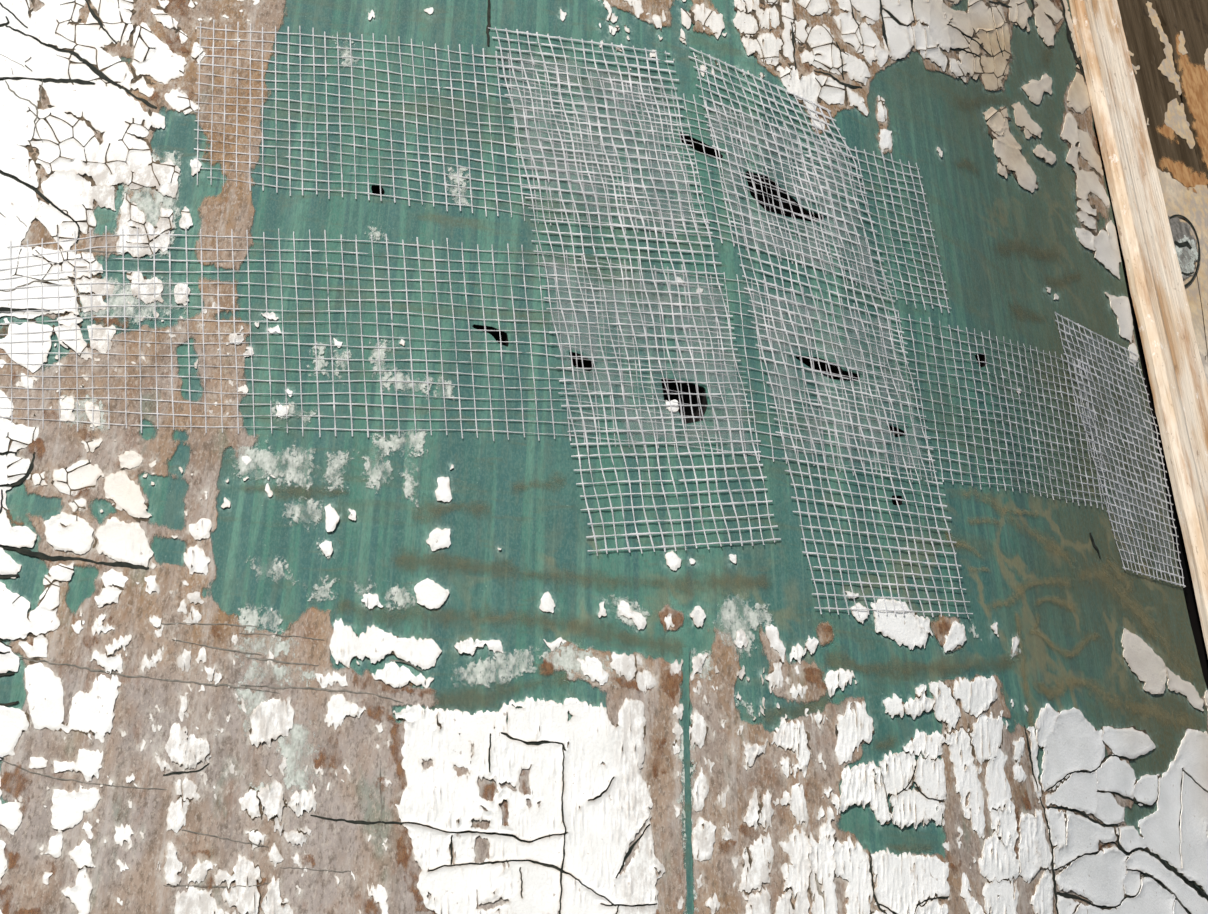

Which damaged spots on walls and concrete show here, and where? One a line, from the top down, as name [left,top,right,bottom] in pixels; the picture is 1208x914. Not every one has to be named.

crack [609,0,915,125]
peeling [598,0,1121,280]
crack [943,0,1086,189]
peeling [1105,292,1139,366]
peeling [0,0,687,914]
crack [0,414,406,736]
crack [390,636,422,671]
peeling [665,551,695,571]
peeling [845,591,966,653]
crack [611,722,709,746]
peeling [689,622,1208,914]
crack [743,795,763,895]